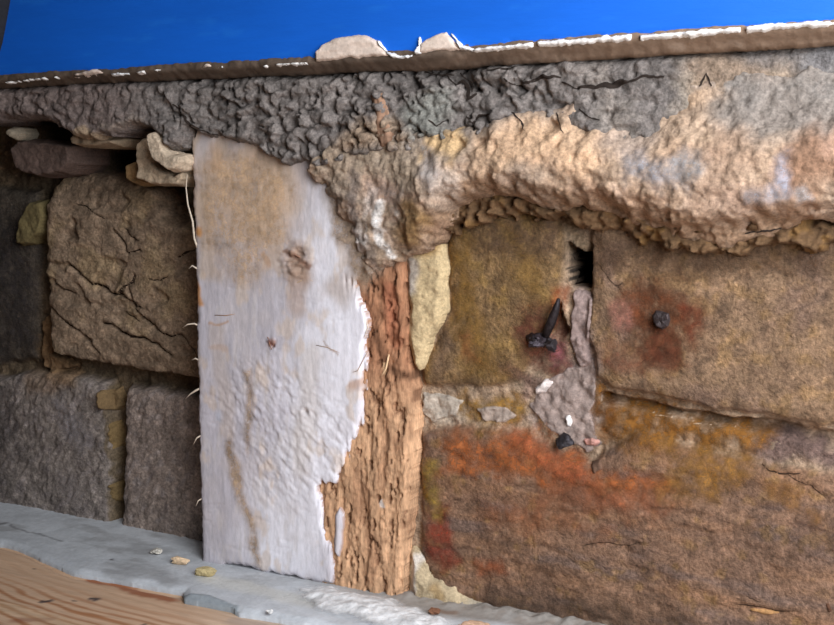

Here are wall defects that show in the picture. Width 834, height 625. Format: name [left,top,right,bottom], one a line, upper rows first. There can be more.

crack [78,204,140,253]
crack [58,265,197,355]
corrosion [517,289,568,376]
corrosion [445,430,671,508]